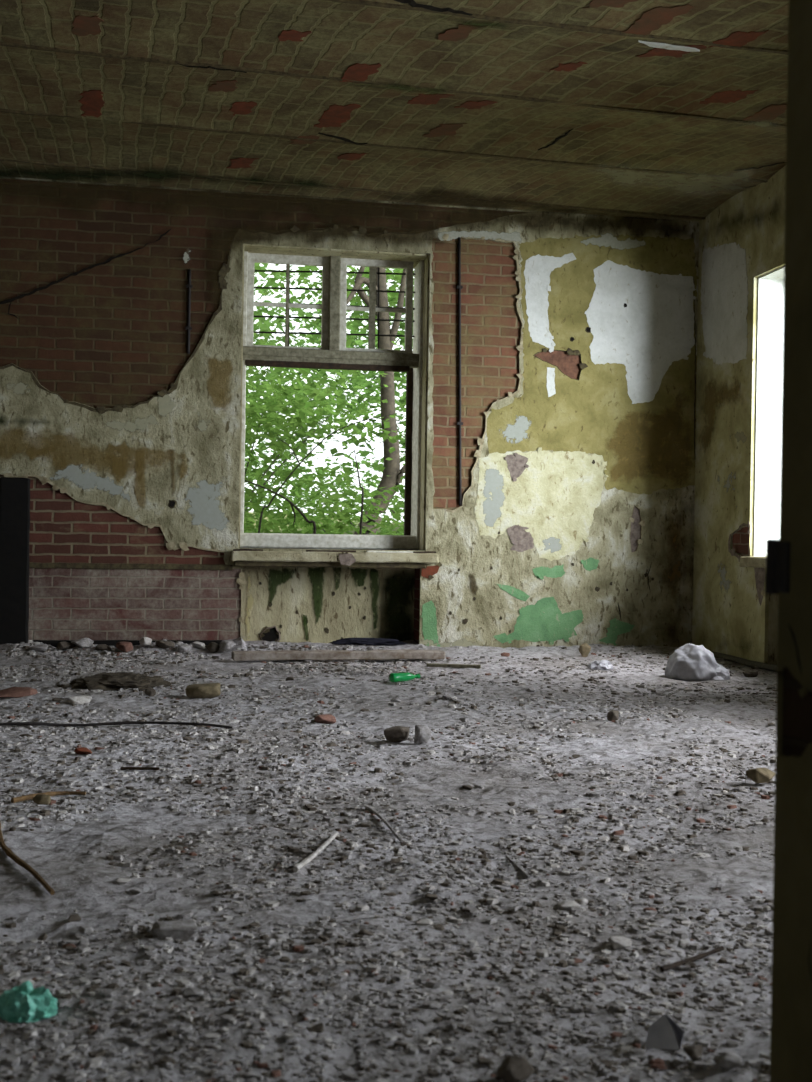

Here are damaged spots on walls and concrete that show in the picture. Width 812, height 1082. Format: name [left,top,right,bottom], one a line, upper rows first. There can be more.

crack [394,0,473,16]
peeling [621,4,769,58]
peeling [79,90,105,117]
peeling [314,104,361,128]
crack [538,129,573,150]
crack [0,228,172,318]
spalling [0,179,750,580]
water stain [608,381,740,484]
spalling [0,473,262,641]
water stain [333,567,379,629]
peeling [493,584,584,647]
spalling [778,663,812,756]